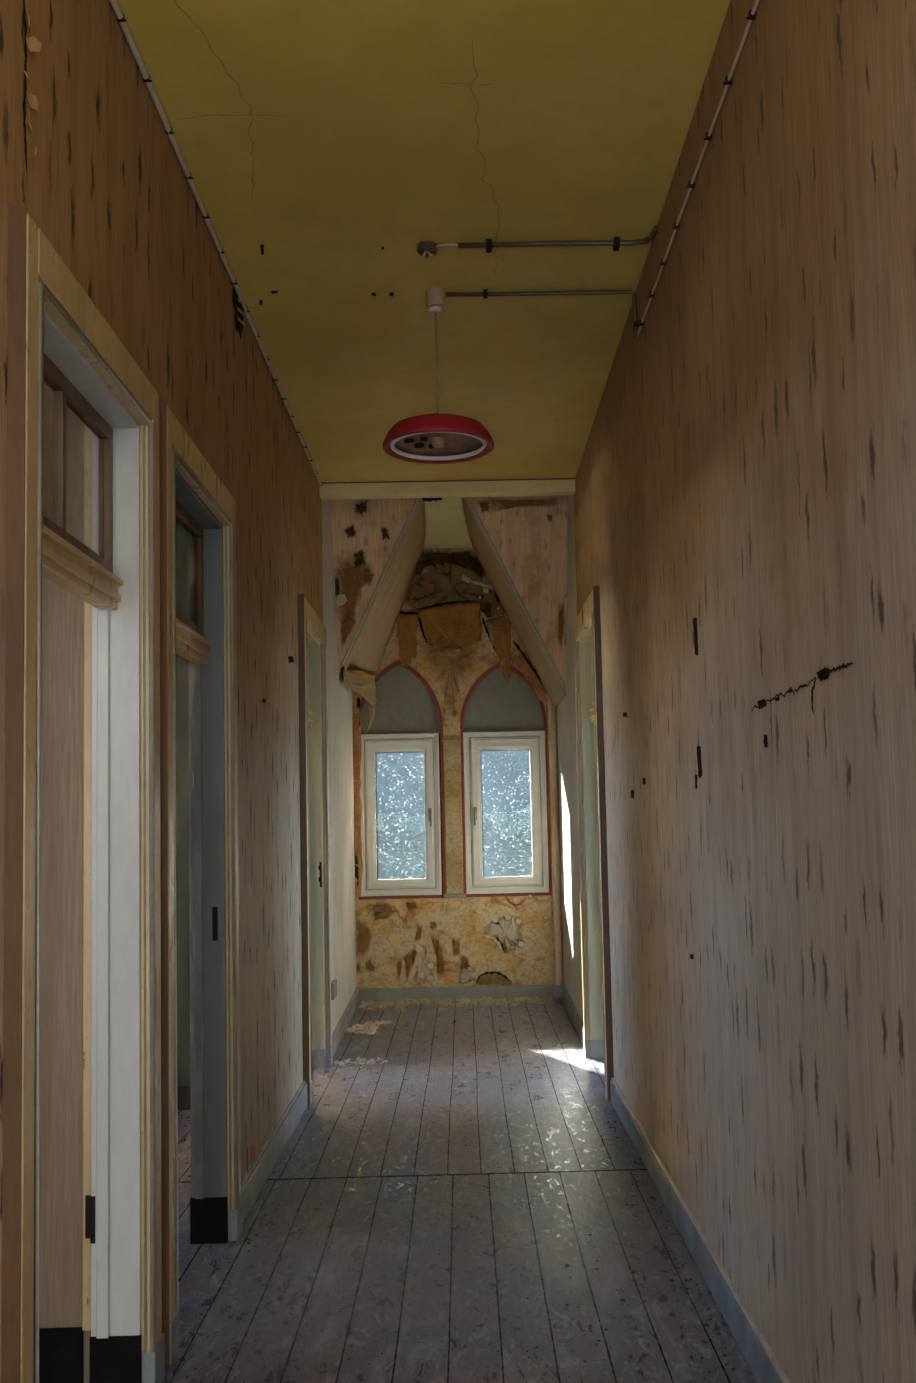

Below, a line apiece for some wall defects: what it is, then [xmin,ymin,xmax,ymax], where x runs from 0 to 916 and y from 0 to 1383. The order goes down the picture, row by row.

flaking render [459,912,527,985]